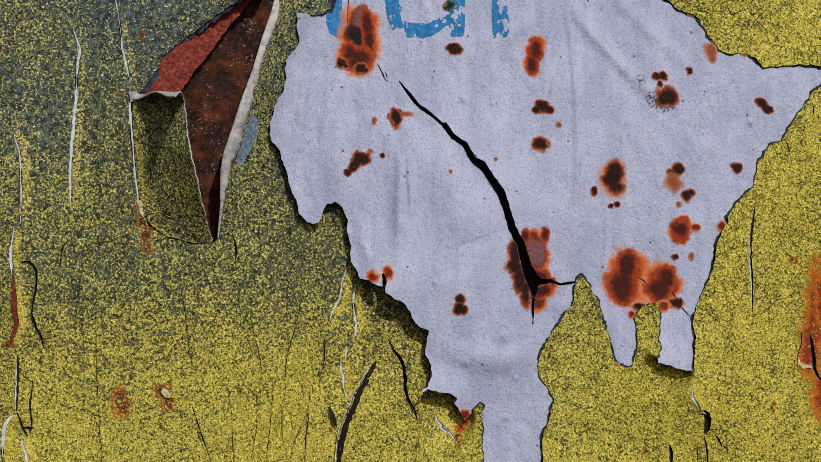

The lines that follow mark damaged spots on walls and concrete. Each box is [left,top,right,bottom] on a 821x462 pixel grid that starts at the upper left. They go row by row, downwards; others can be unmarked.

corrosion [336,5,380,77]
corrosion [523,35,546,77]
corrosion [647,71,679,112]
corrosion [343,149,385,177]
crack [377,63,575,325]
corrosion [504,226,558,313]
peeling [270,0,821,462]
corrosion [591,158,626,208]
corrosion [602,248,694,318]
corrosion [665,162,701,245]
crack [175,252,209,455]
crack [228,261,456,462]